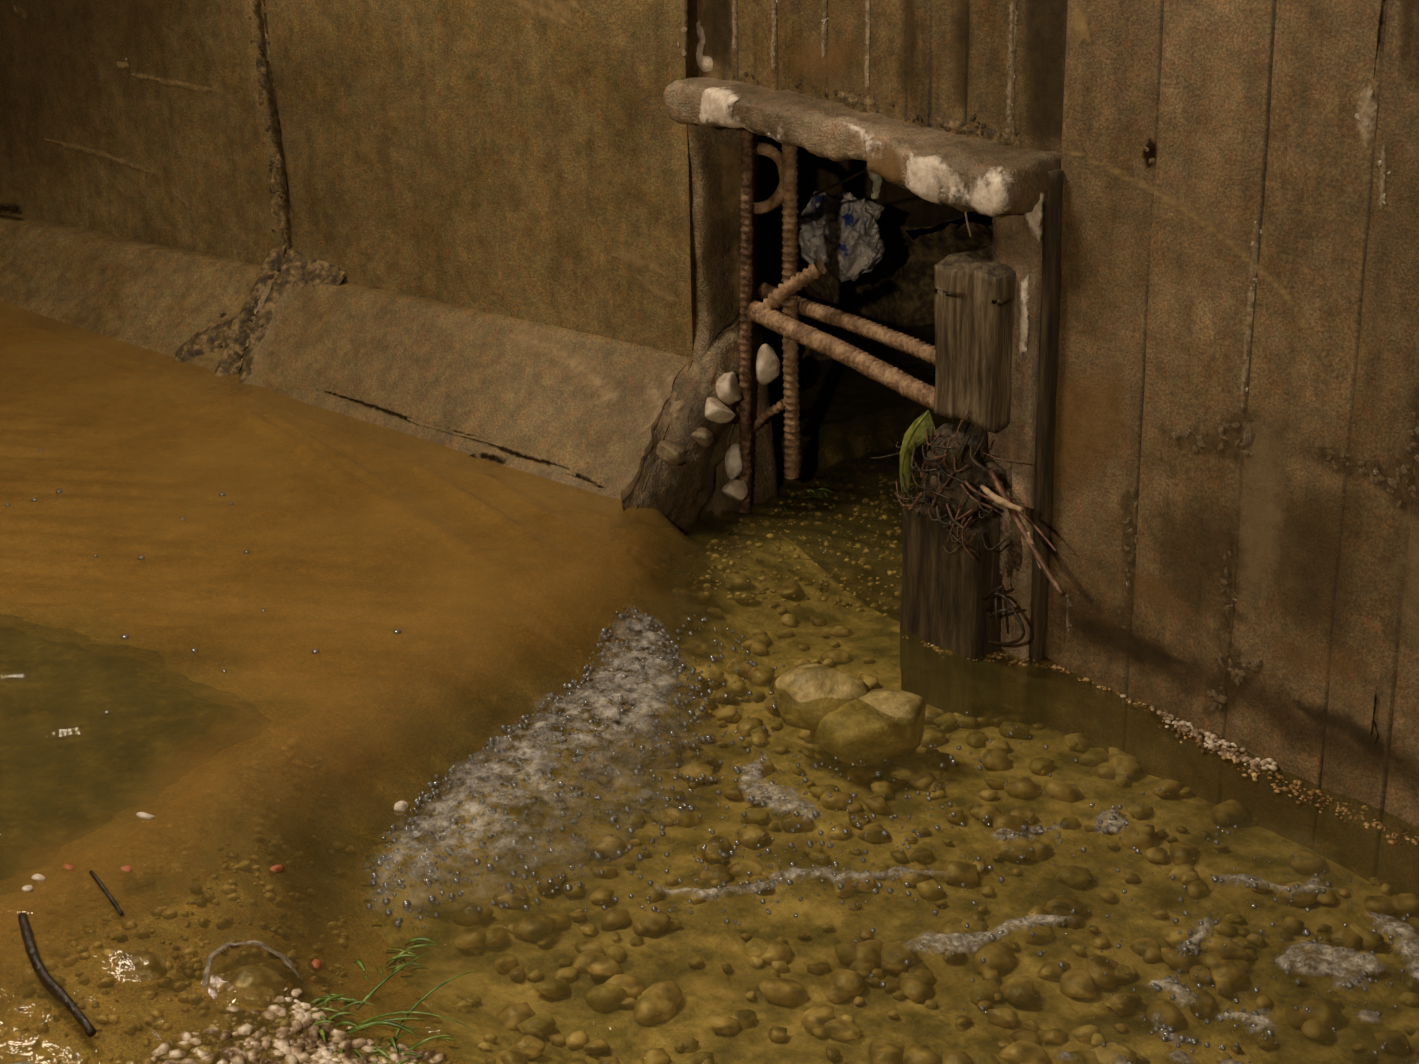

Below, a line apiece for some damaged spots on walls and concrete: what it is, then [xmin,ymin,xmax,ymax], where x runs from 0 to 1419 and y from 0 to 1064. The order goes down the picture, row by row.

spalling [824,86,895,154]
spalling [908,113,1020,148]
crack [0,203,22,214]
crack [215,0,345,383]
peeling [905,153,1014,217]
peeling [1025,193,1043,241]
peeling [1019,277,1028,354]
peeling [509,331,619,406]
spalling [621,300,753,537]
water stain [1063,595,1419,779]